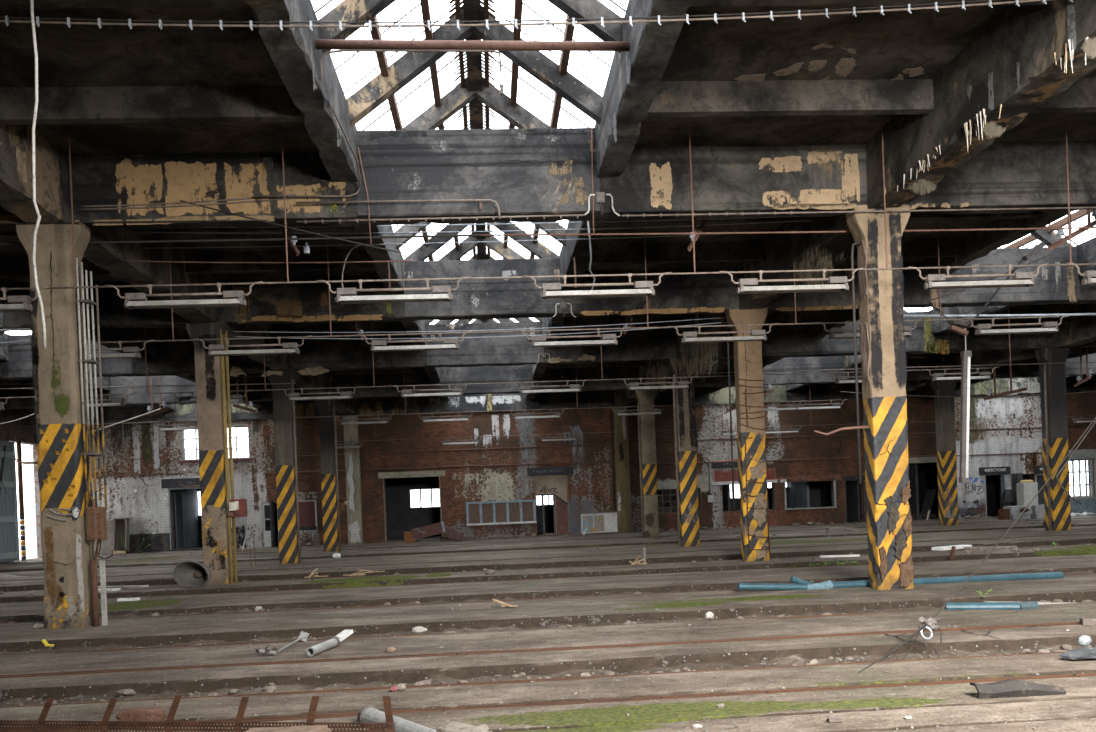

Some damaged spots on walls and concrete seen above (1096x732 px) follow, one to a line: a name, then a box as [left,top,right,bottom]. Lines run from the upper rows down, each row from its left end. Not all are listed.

peeling [735,43,856,82]
peeling [93,158,347,226]
peeling [548,158,595,205]
peeling [649,162,673,210]
damp [867,208,907,389]
spalling [879,480,914,588]